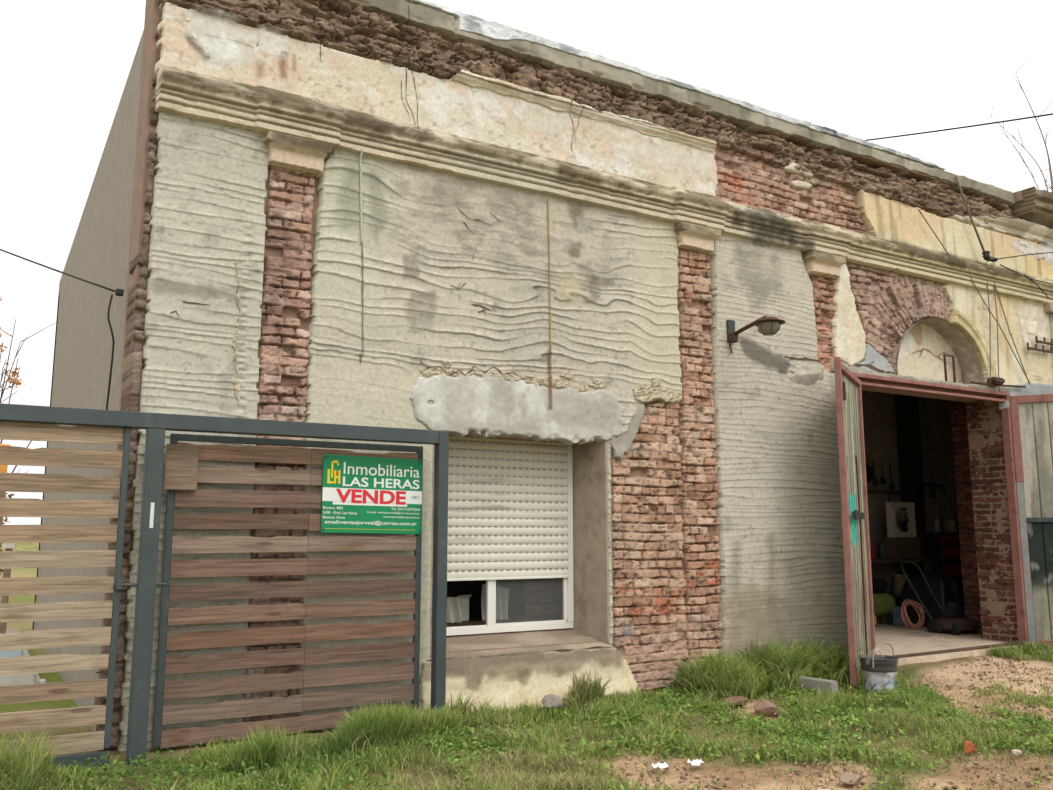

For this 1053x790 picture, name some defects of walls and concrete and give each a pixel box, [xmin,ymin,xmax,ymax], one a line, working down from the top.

crack [169,0,715,157]
spalling [157,0,1019,236]
crack [458,208,500,259]
spalling [257,165,315,422]
crack [451,282,491,314]
spalling [809,262,950,374]
spalling [253,484,305,492]
spalling [255,462,305,470]
spalling [610,249,723,691]
spalling [251,529,304,538]
spalling [248,619,301,628]
spalling [244,712,297,722]